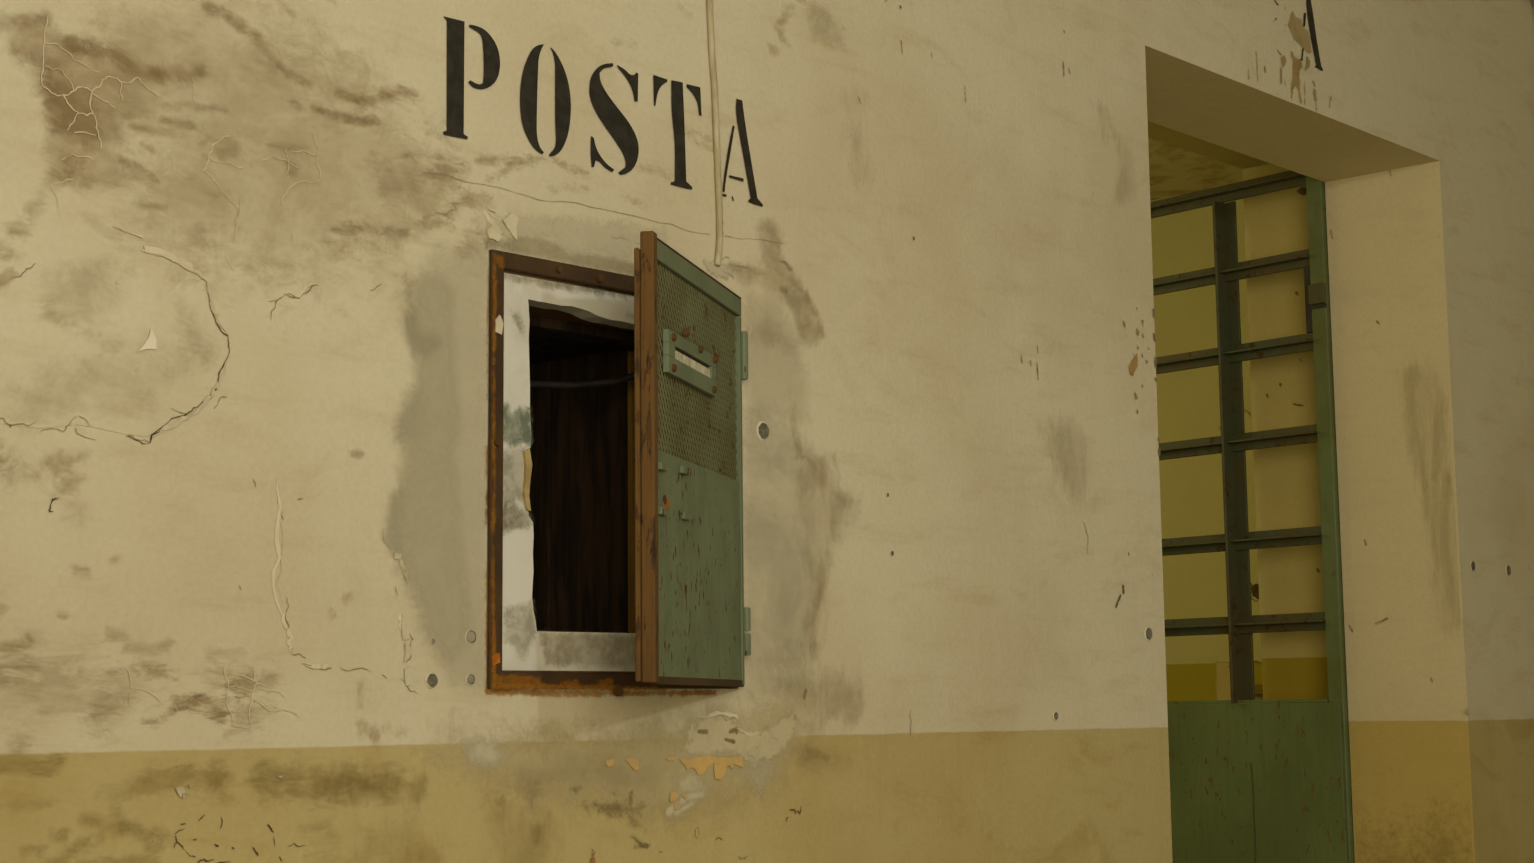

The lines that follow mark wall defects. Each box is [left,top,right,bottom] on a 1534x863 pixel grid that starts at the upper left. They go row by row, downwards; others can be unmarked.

crack [41,16,196,211]
crack [127,132,321,444]
crack [0,416,91,432]
flaking render [667,689,807,780]